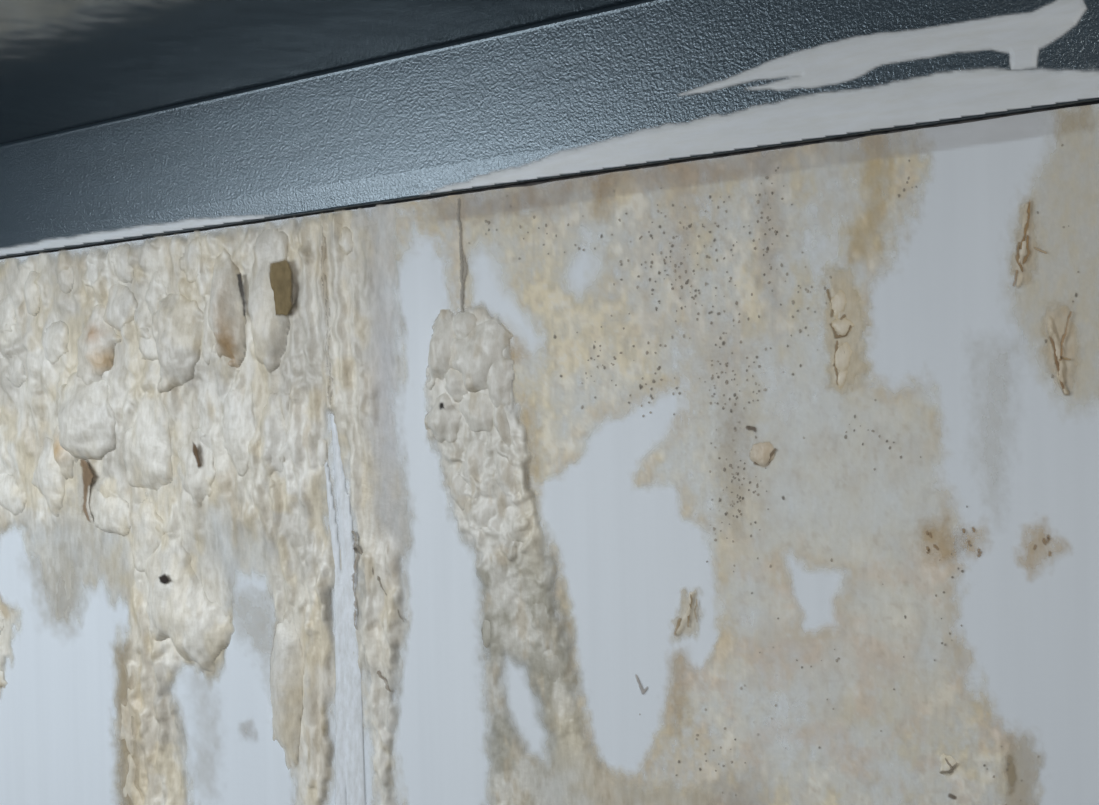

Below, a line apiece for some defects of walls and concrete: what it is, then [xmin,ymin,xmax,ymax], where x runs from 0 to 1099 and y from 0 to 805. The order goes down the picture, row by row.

peeling [1012,201,1047,288]
water stain [1018,112,1099,400]
peeling [826,269,866,393]
peeling [1044,306,1077,395]
water stain [395,131,1040,805]